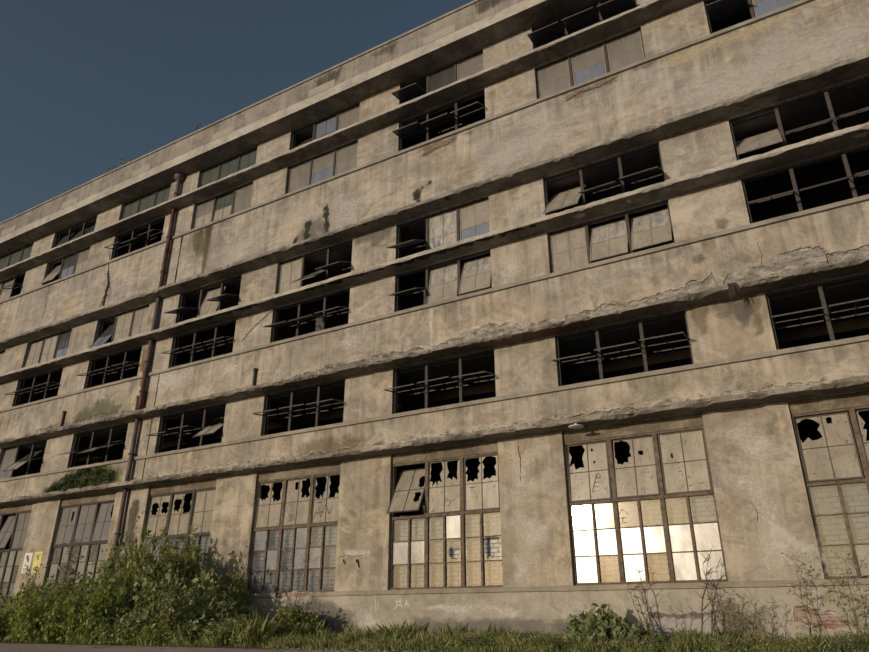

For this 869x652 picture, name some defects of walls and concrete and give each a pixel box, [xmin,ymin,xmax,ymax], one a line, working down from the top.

damp [293,199,358,243]
crack [99,254,110,308]
damp [193,225,212,274]
peeling [306,224,536,293]
peeling [184,298,274,325]
spalling [282,242,869,381]
flaking render [791,605,851,631]